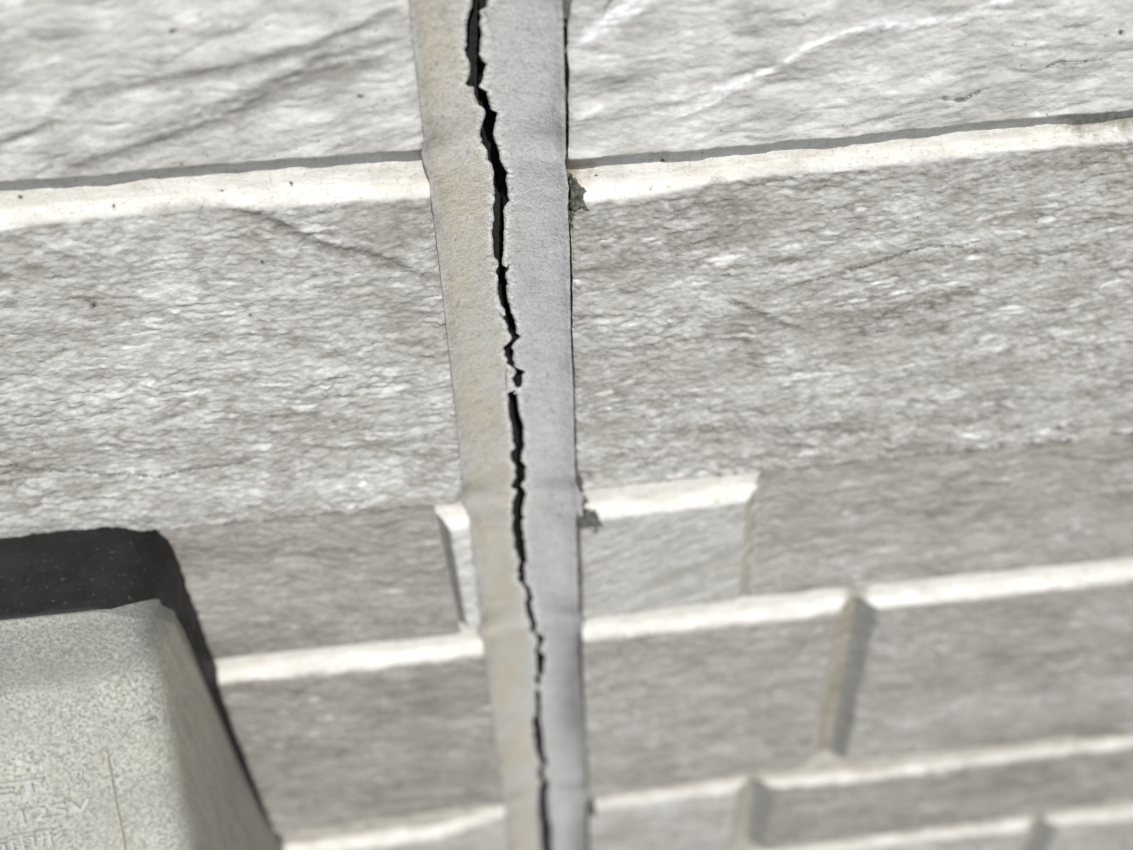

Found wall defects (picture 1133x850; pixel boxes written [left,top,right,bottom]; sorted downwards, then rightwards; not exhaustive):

crack [465,0,551,850]